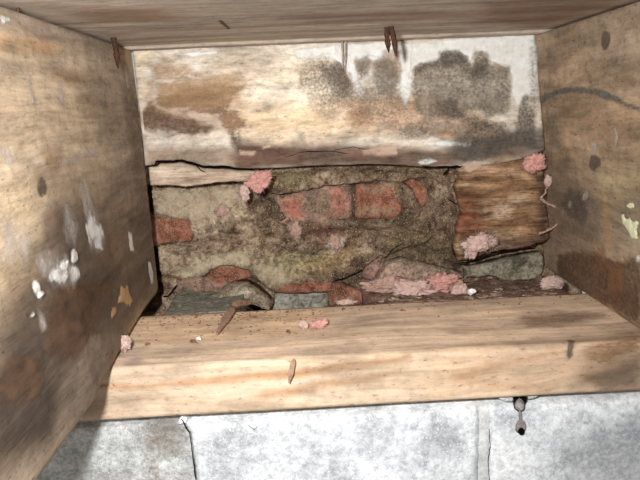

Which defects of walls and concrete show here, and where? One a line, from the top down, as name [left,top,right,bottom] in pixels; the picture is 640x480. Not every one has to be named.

leakage [124,59,245,204]
mould [301,63,349,107]
mould [357,59,401,123]
leakage [401,51,636,159]
crack [150,159,238,172]